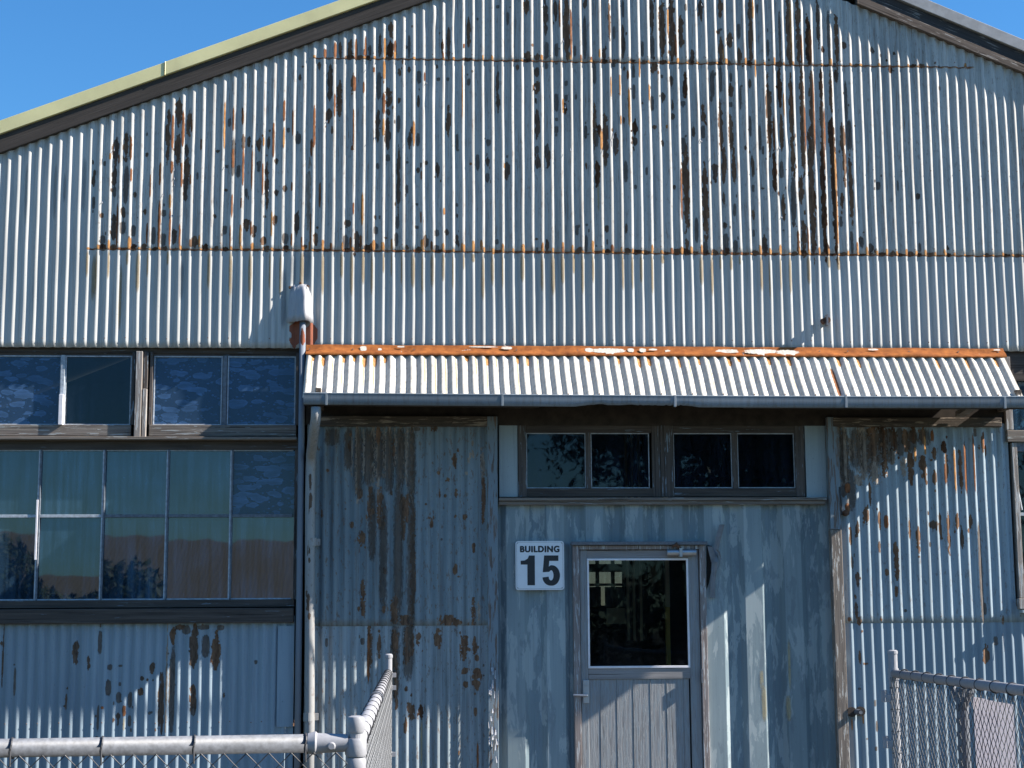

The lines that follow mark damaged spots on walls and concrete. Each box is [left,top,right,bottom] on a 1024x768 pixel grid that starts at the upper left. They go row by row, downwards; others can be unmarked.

corrosion [86,0,1024,295]
corrosion [944,432,986,495]